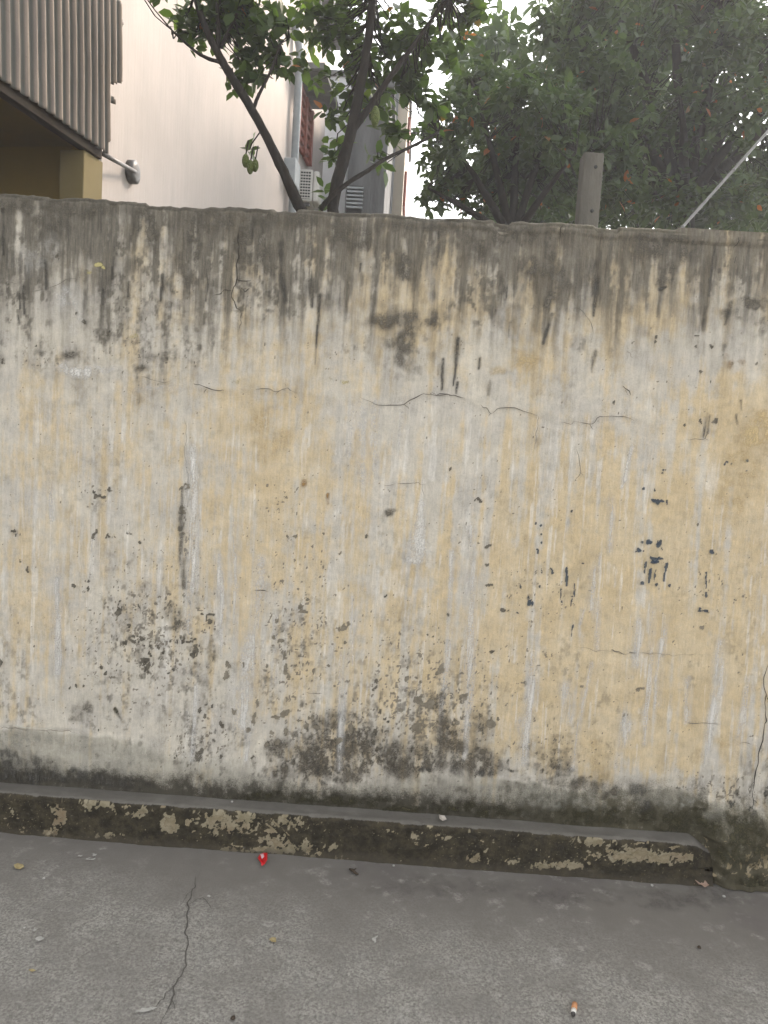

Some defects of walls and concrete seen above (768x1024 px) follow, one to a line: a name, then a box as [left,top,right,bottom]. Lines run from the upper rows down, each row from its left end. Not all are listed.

water stain [309,279,321,347]
water stain [373,312,437,366]
water stain [441,337,460,392]
crack [362,393,538,447]
water stain [179,446,198,591]
water stain [239,647,534,801]
crack [748,666,768,817]
spalling [164,817,192,830]
spalling [223,817,303,851]
spalling [539,839,684,868]
water stain [542,749,768,867]
crack [156,877,212,1022]